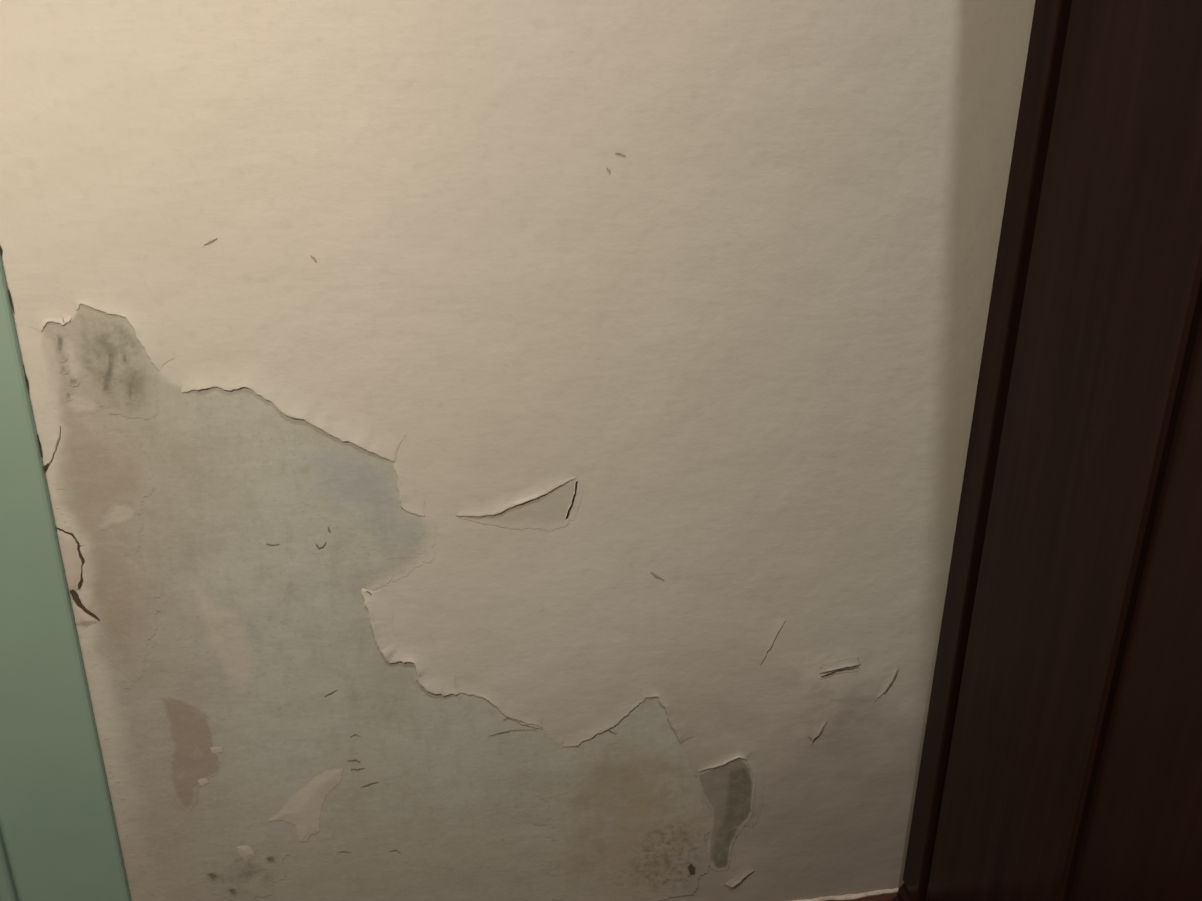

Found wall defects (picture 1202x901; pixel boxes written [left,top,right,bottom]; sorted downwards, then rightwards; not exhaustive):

damp [51,310,163,688]
peeling [29,288,763,901]
damp [202,844,290,901]
damp [532,741,713,901]